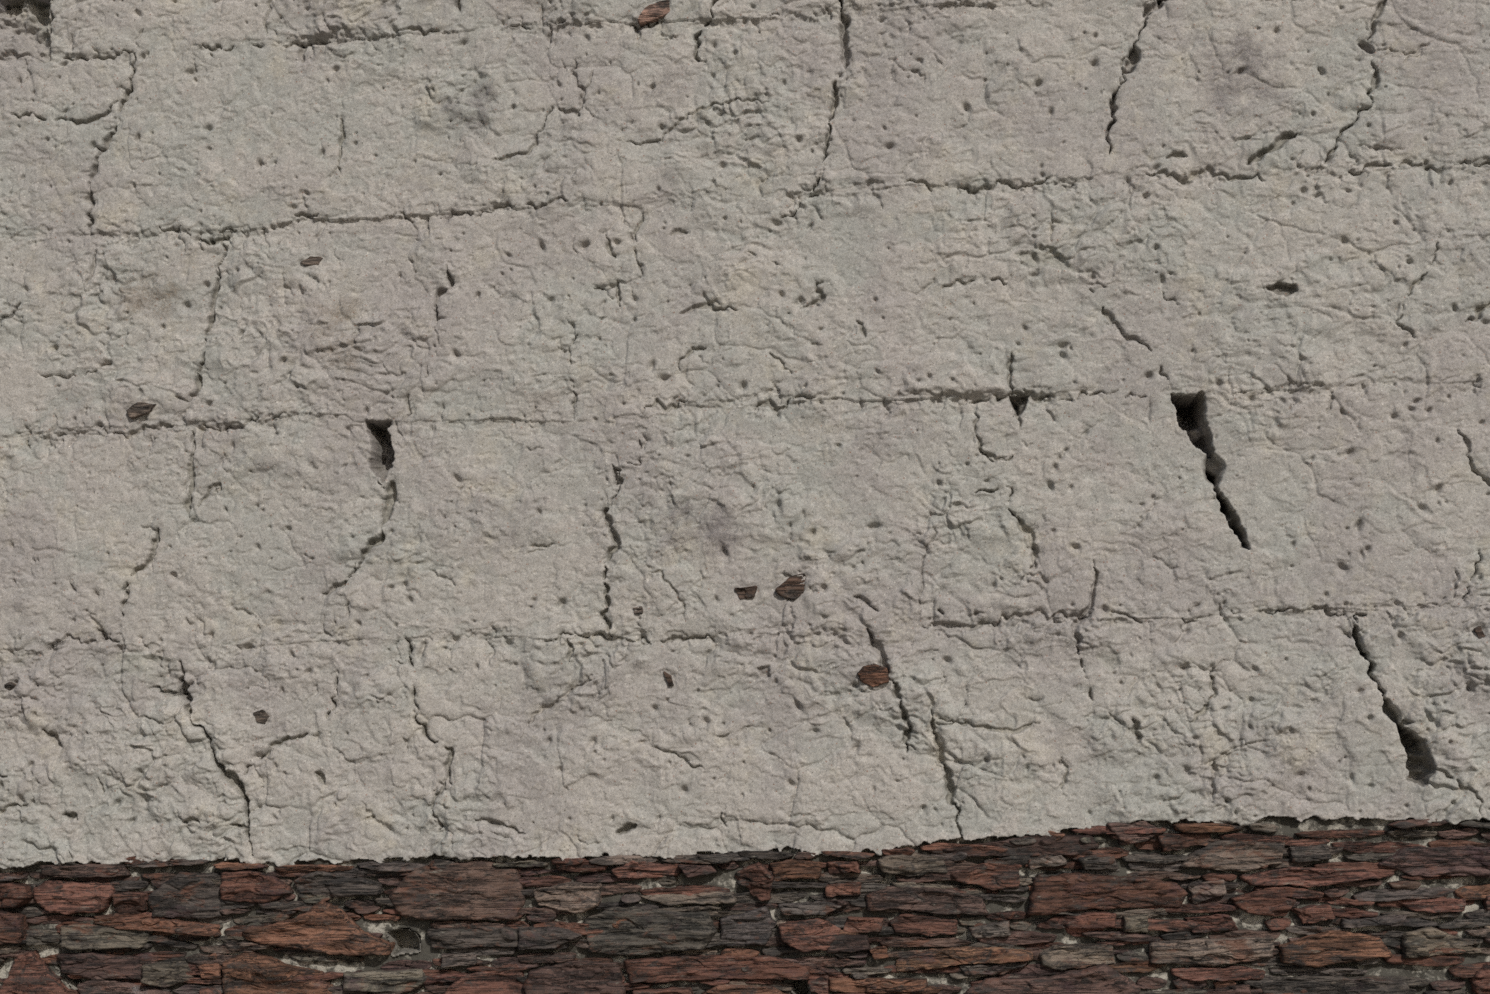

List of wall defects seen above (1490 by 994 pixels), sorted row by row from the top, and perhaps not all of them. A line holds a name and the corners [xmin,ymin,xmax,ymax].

spalling [0,0,52,64]
crack [782,0,884,219]
crack [1105,0,1167,155]
crack [1145,132,1297,185]
crack [1324,0,1490,176]
crack [322,482,397,618]
crack [525,303,737,731]
crack [918,289,1169,743]
crack [1204,456,1223,484]
crack [160,665,338,852]
crack [856,595,1040,837]
crack [1231,605,1413,727]